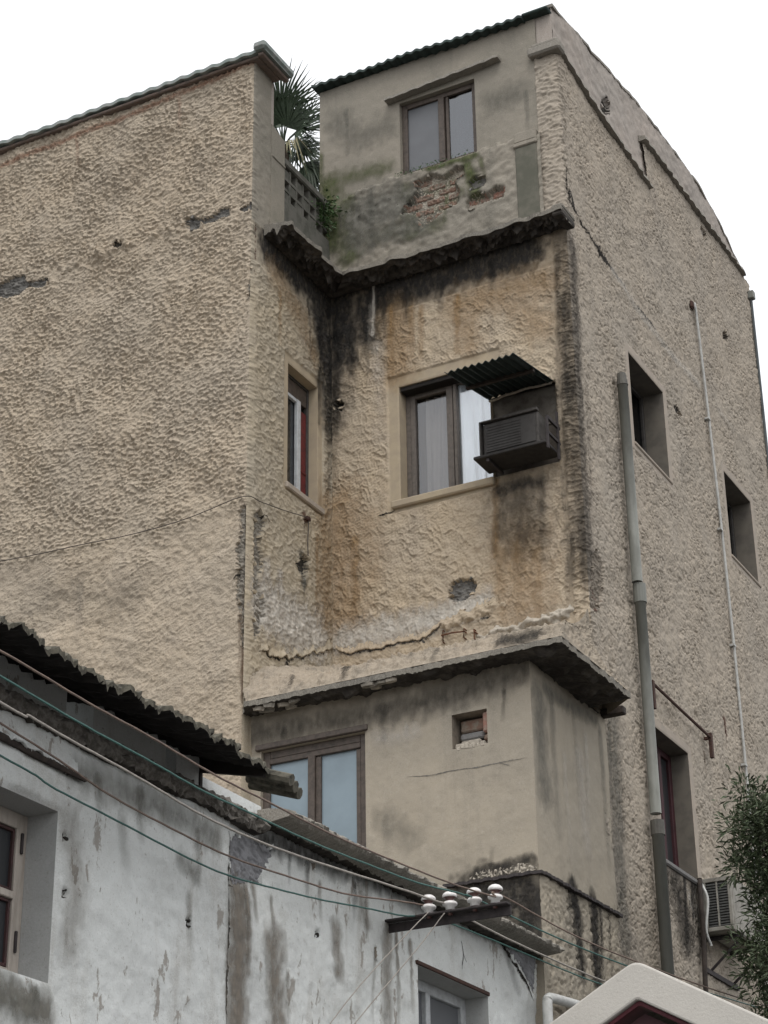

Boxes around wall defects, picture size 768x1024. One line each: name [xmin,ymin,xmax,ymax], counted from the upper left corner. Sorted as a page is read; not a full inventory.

spalling [185,201,258,231]
flaking render [400,167,505,227]
crack [566,169,654,327]
spalling [0,274,49,299]
damp [259,228,543,437]
crack [243,595,499,666]
flaking render [440,577,507,644]
crack [409,758,522,777]
spalling [229,831,274,885]
damp [227,878,256,1024]
damp [267,930,289,1024]
damp [568,876,603,988]